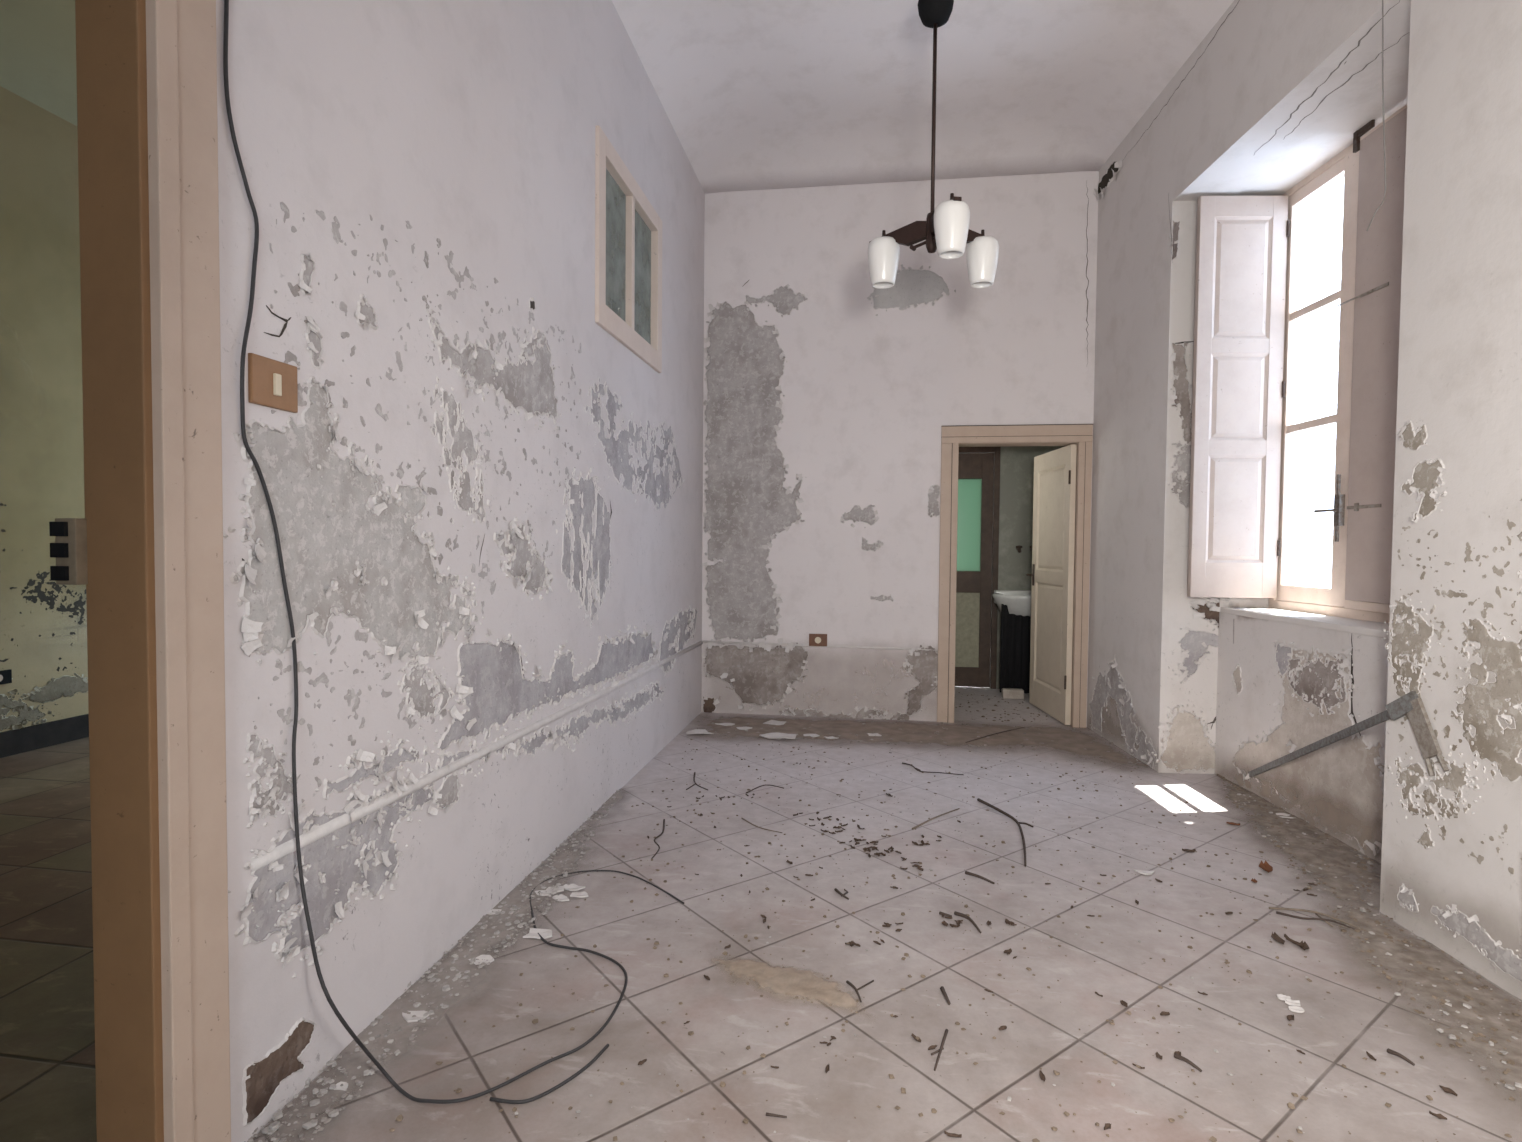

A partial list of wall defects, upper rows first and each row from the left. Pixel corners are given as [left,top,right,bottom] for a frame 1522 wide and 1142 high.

peeling [223,202,938,978]
peeling [927,485,940,518]
peeling [1089,420,1522,874]